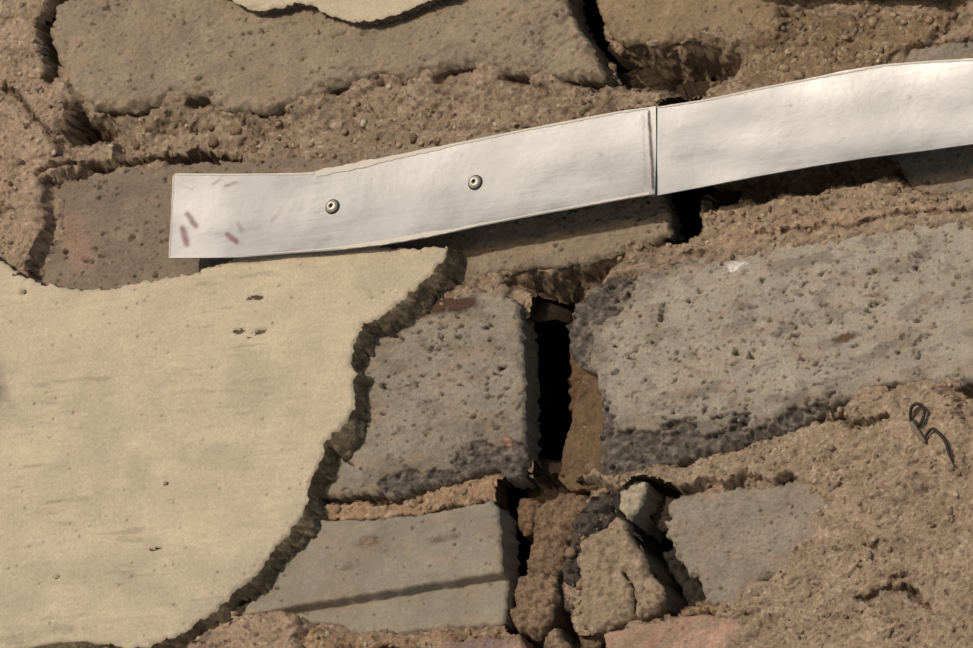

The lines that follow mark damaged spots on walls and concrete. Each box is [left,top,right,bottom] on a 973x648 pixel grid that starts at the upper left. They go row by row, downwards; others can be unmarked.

spalling [231,0,442,26]
crack [582,0,728,106]
crack [4,85,122,174]
crack [671,186,743,246]
spalling [0,256,87,295]
spalling [558,274,836,496]
spalling [136,247,466,648]
spalling [379,440,529,498]
crack [494,290,584,577]
crack [622,471,682,497]
crack [622,535,702,617]
crack [504,626,537,648]